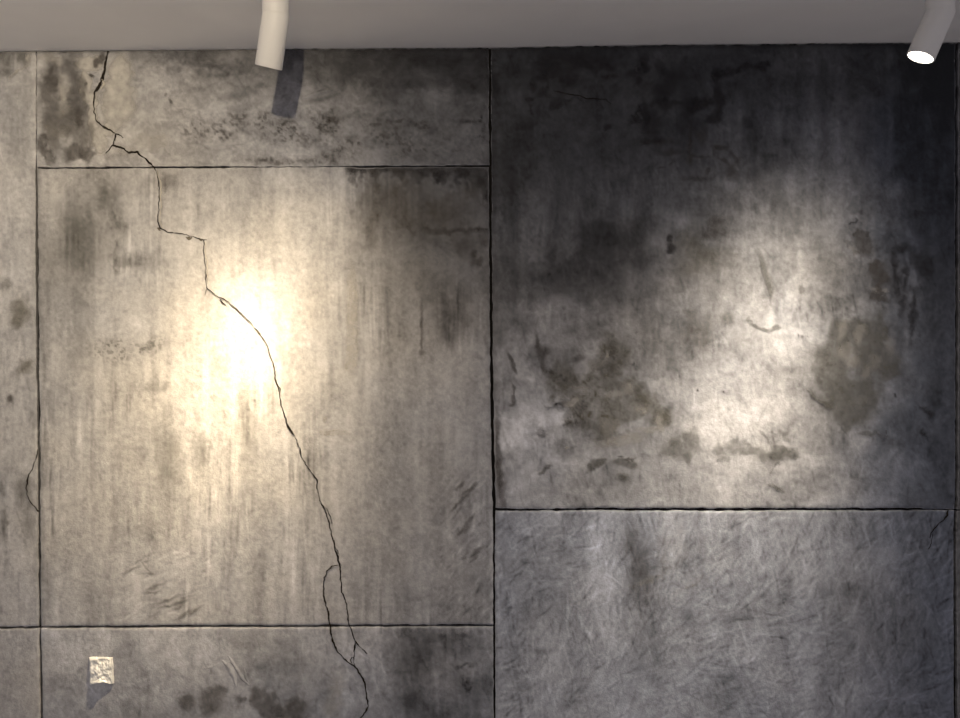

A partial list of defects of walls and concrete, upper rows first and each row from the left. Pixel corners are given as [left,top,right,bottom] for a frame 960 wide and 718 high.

leakage [67,144,88,160]
leakage [347,168,488,231]
crack [93,51,368,718]
leakage [549,341,671,439]
leakage [817,313,899,430]
leakage [663,432,697,463]
crack [25,450,39,512]